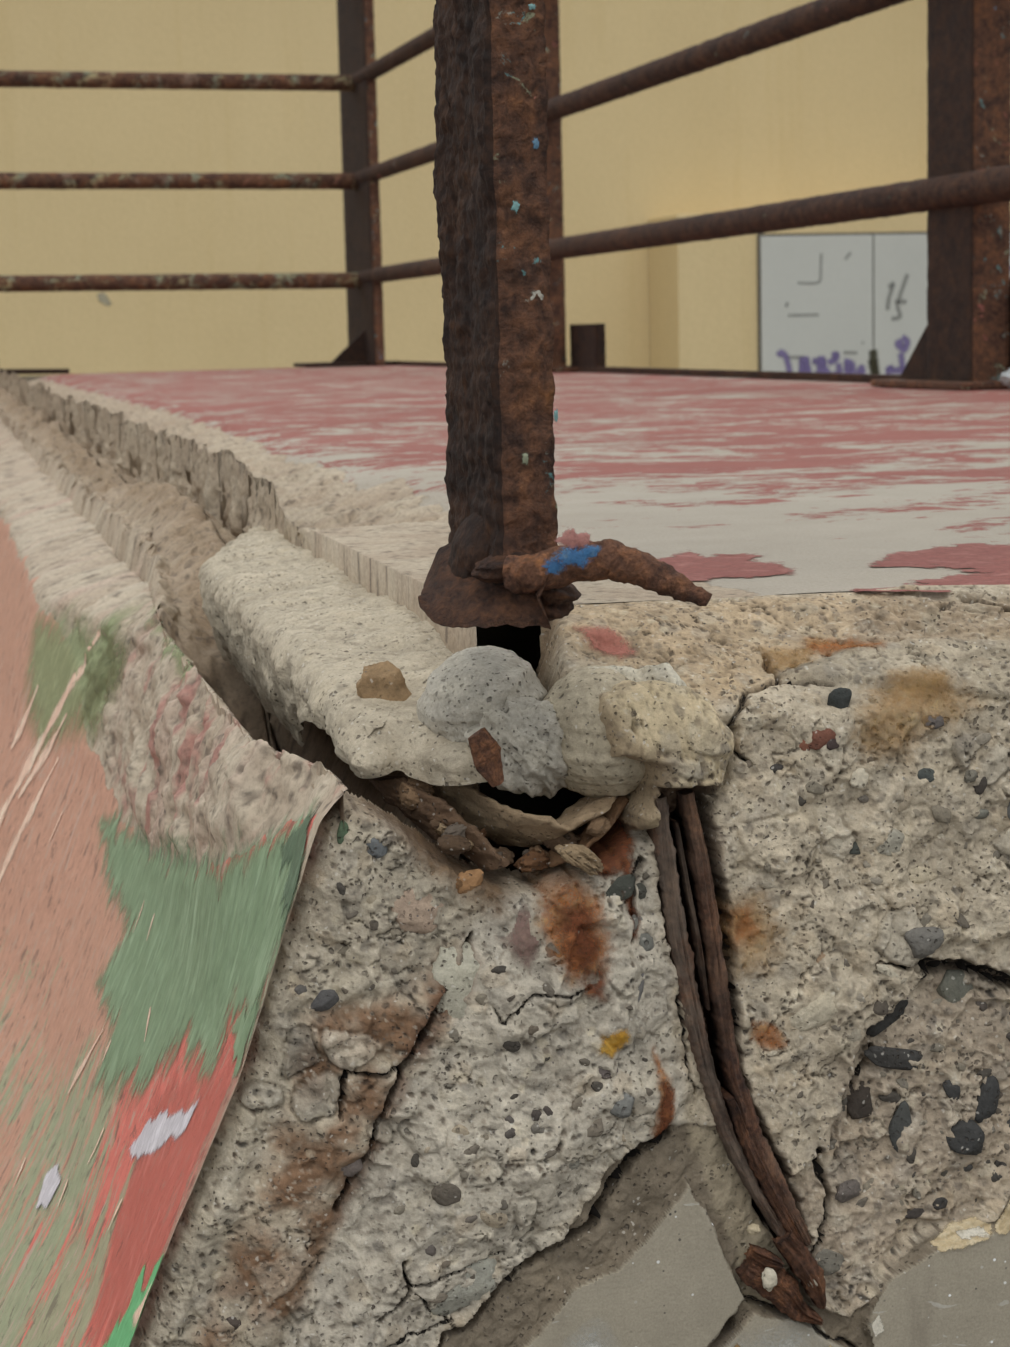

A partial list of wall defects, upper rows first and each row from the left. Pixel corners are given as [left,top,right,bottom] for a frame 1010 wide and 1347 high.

spalling [0,369,1010,1347]
rust [508,882,605,1000]
crack [879,957,1010,984]
rust [754,1023,786,1047]
rust [655,1056,674,1136]
rust [735,1230,826,1326]